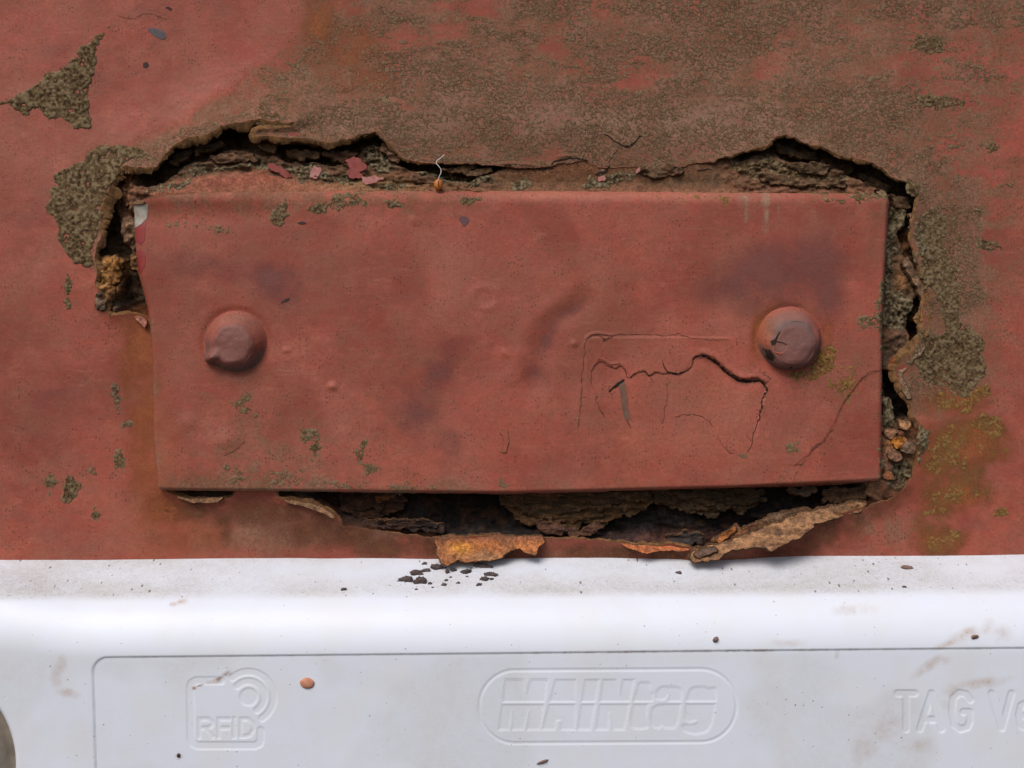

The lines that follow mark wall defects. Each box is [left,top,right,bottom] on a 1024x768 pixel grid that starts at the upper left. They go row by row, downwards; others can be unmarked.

spalling [94,146,879,328]
spalling [279,200,931,567]
spalling [169,490,234,504]